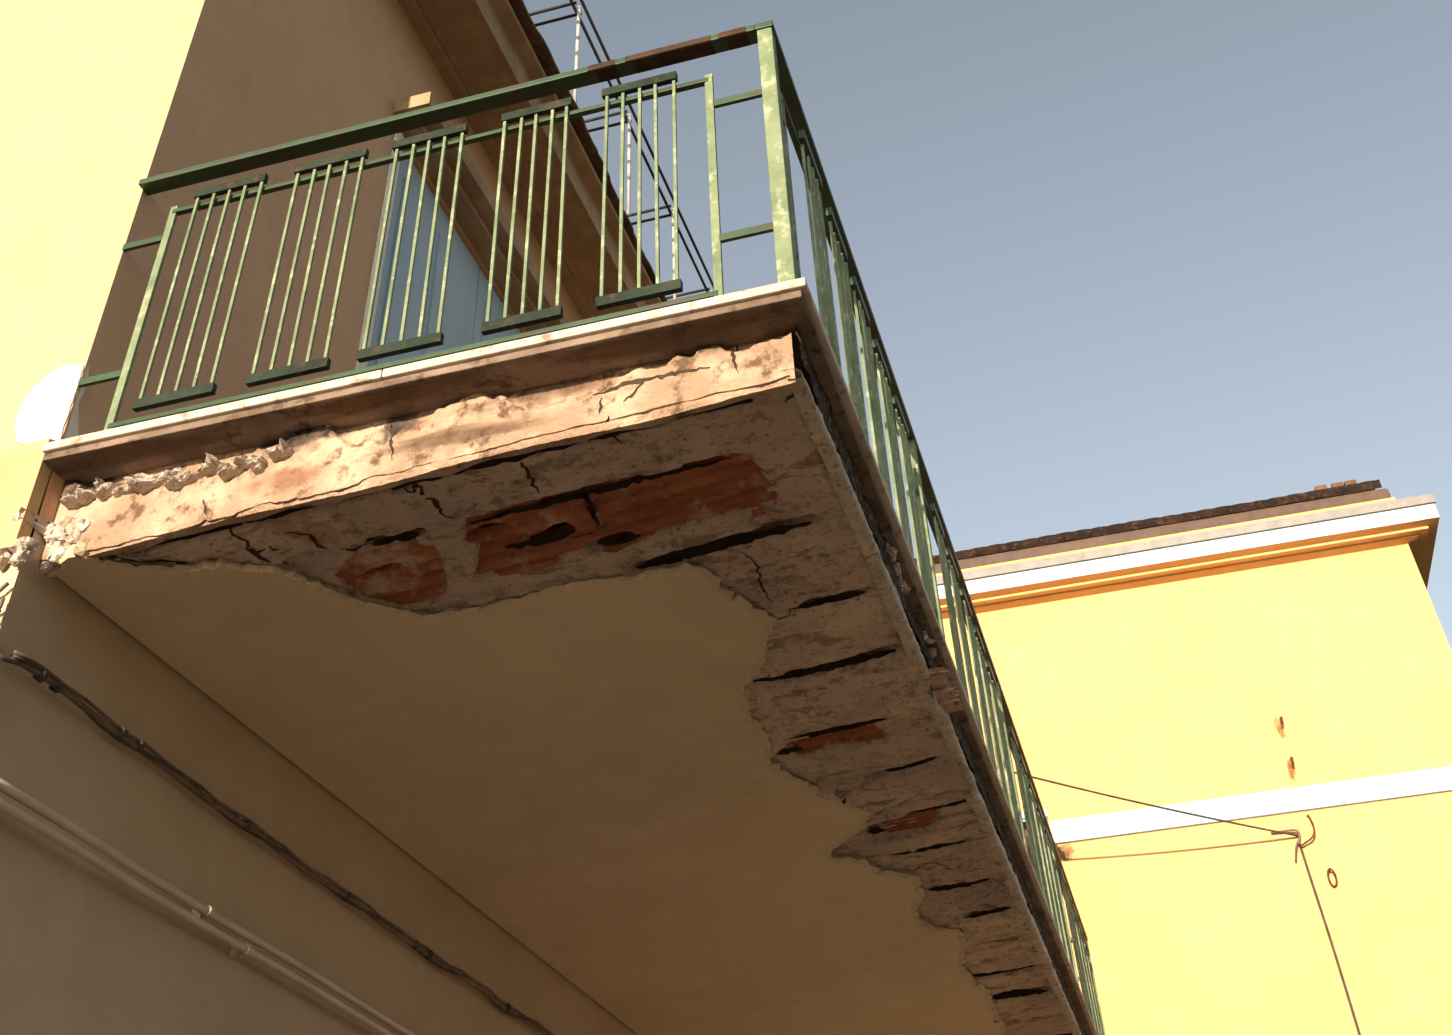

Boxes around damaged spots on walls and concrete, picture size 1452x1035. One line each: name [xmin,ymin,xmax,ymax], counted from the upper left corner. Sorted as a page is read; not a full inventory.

crack [593,345,739,444]
crack [389,421,454,519]
crack [519,462,540,494]
crack [75,499,373,565]
crack [740,552,792,620]
spalling [0,375,1073,1035]